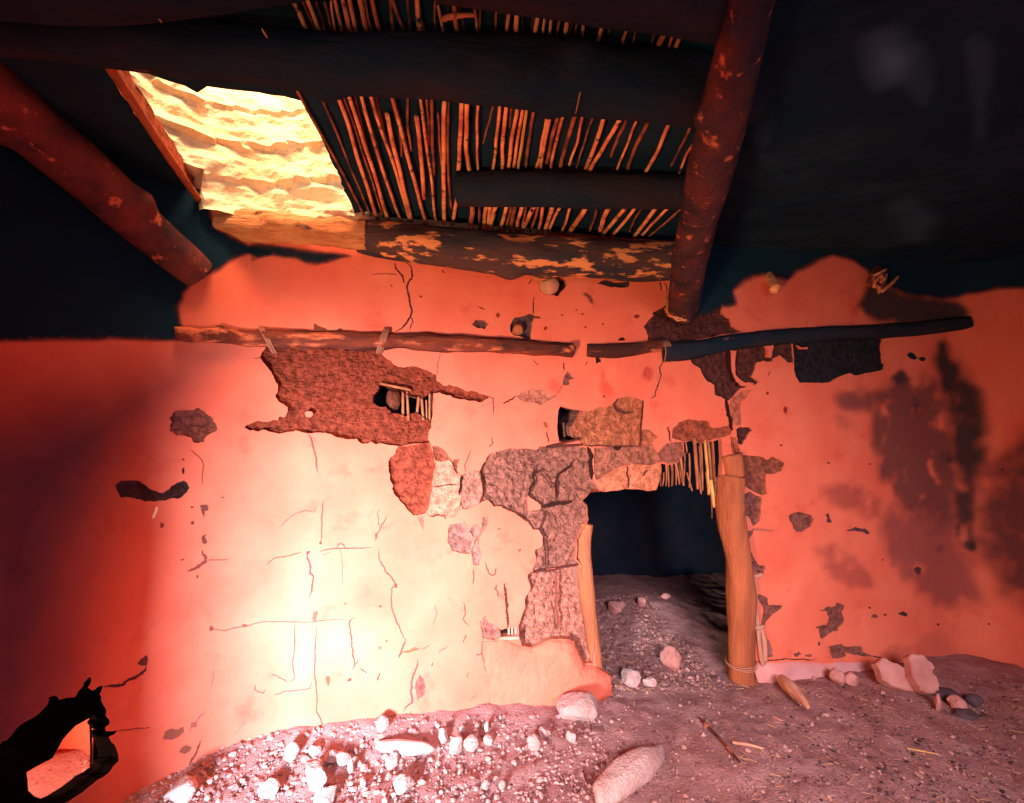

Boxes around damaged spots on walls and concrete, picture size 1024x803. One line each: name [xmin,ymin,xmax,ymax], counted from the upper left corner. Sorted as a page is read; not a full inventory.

crack [374,263,414,331]
spalling [644,304,762,342]
spalling [170,408,217,443]
crack [308,433,318,472]
spalling [245,348,489,565]
spalling [572,396,657,448]
spalling [672,339,883,537]
spalling [115,480,189,502]
flaking render [526,495,541,511]
crack [187,550,228,572]
crack [215,504,509,725]
spalling [818,602,871,658]